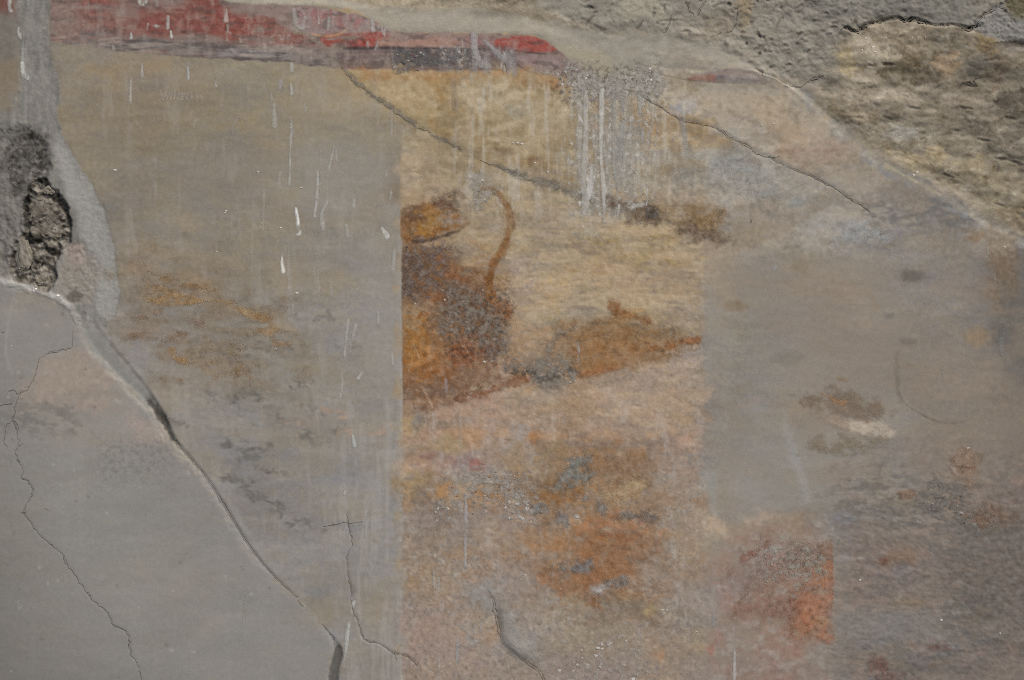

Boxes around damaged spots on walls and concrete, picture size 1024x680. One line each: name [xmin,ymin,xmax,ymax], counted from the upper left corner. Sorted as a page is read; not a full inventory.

crack [840,1,1006,34]
crack [344,69,559,189]
damp [560,65,665,224]
spalling [10,179,72,292]
corrosion [401,187,533,409]
corrosion [555,301,700,376]
crack [149,400,301,604]
crack [324,553,420,680]